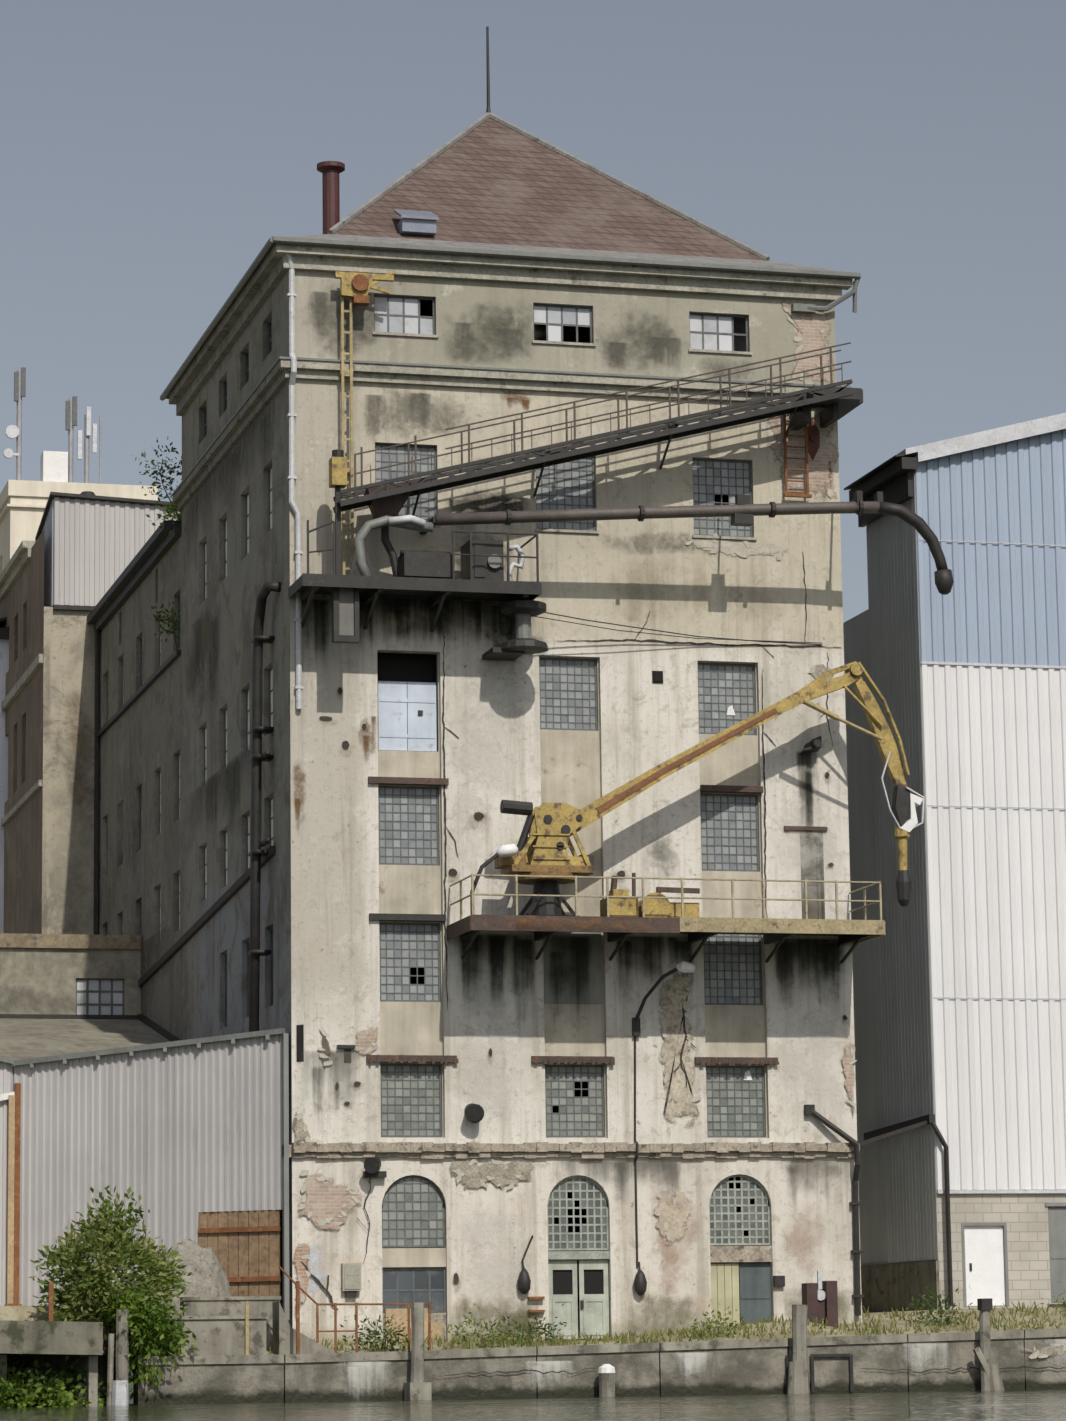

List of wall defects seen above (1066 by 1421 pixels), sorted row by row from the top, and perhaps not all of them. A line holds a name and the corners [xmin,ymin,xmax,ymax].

damp [460,312,522,357]
damp [607,327,677,358]
flaking render [781,301,835,383]
flaking render [767,413,839,499]
corrosion [295,766,304,817]
damp [492,939,533,986]
damp [778,943,795,982]
damp [819,944,839,977]
spalling [296,1024,333,1068]
crack [673,1004,696,1088]
flaking render [450,1159,535,1190]
flaking render [298,1170,363,1233]